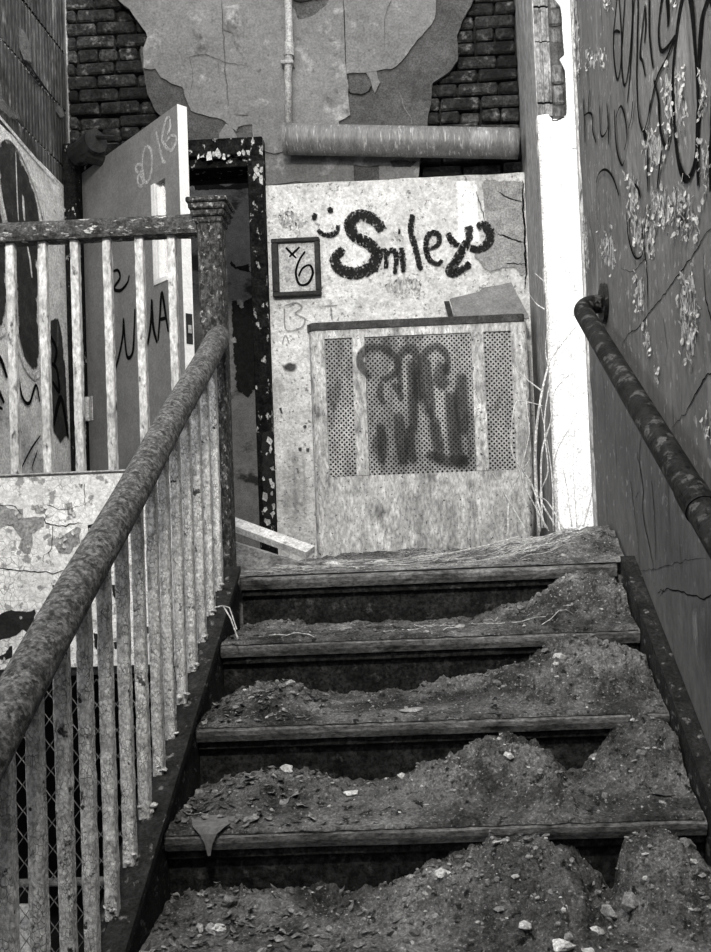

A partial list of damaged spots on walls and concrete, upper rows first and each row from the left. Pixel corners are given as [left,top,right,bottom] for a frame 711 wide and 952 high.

flaking render [292,0,329,20]
flaking render [66,0,264,192]
flaking render [339,0,527,275]
peeling [581,215,616,277]
peeling [622,60,711,385]
crack [588,212,711,357]
crack [672,373,711,428]
peeling [0,502,47,554]
peeling [54,502,92,554]
crack [631,441,711,600]
peeling [0,610,37,664]